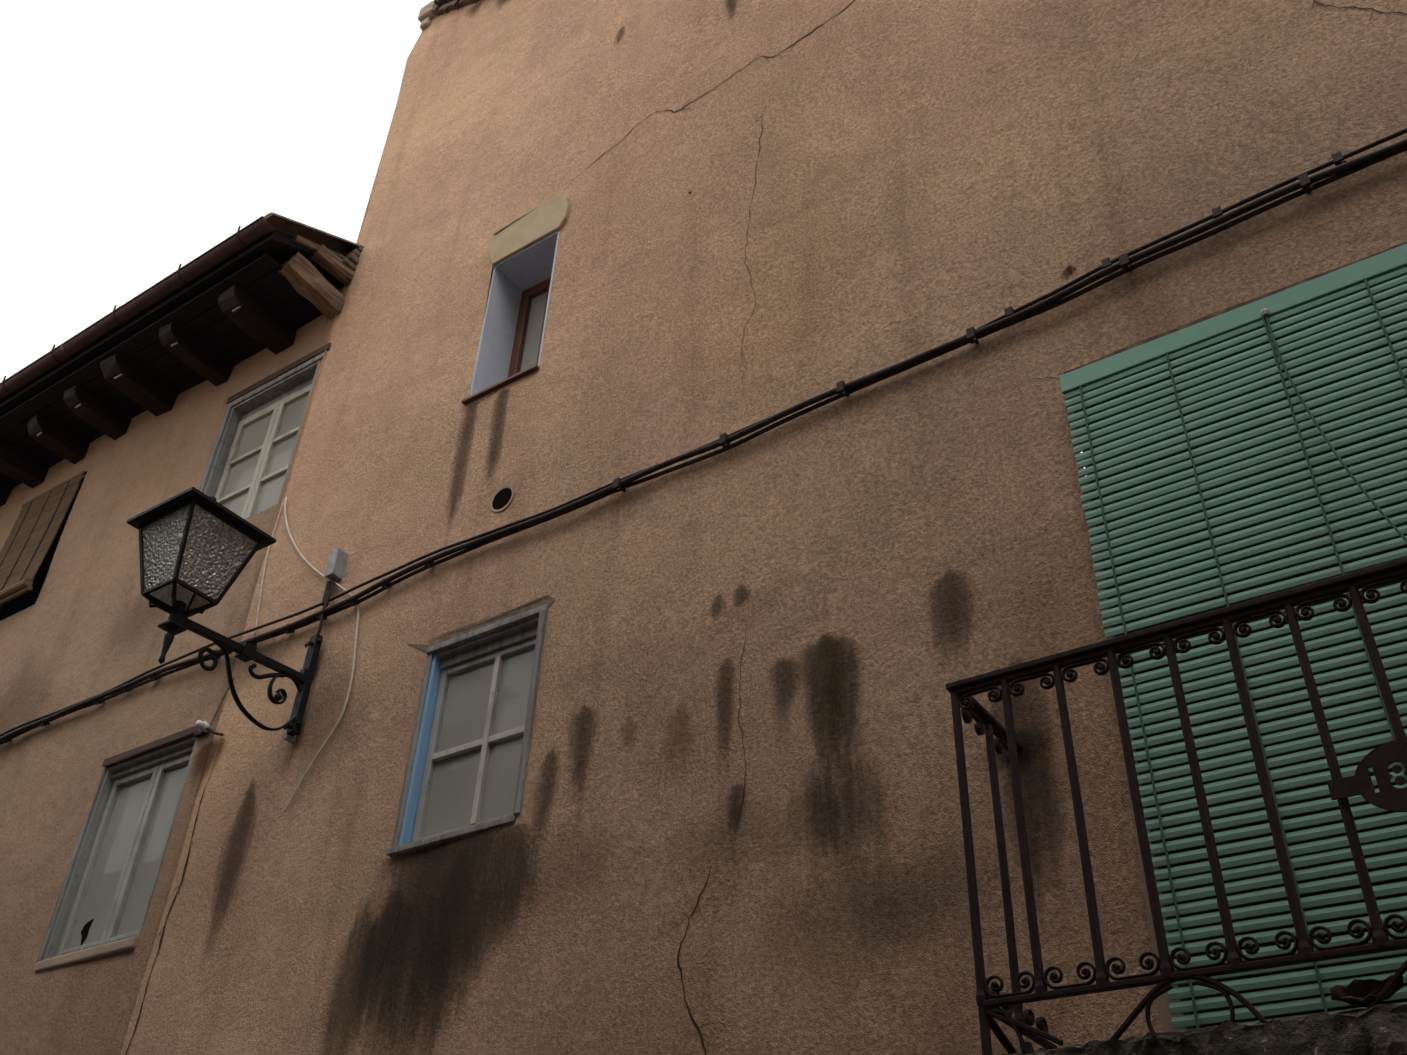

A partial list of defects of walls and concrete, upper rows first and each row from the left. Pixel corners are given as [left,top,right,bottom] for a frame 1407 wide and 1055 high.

crack [1308,0,1407,19]
crack [566,0,854,189]
crack [741,103,767,410]
water stain [451,403,476,512]
water stain [491,389,507,465]
water stain [936,572,967,637]
water stain [538,750,556,821]
water stain [575,707,591,776]
crack [677,626,747,1055]
water stain [326,825,528,1055]